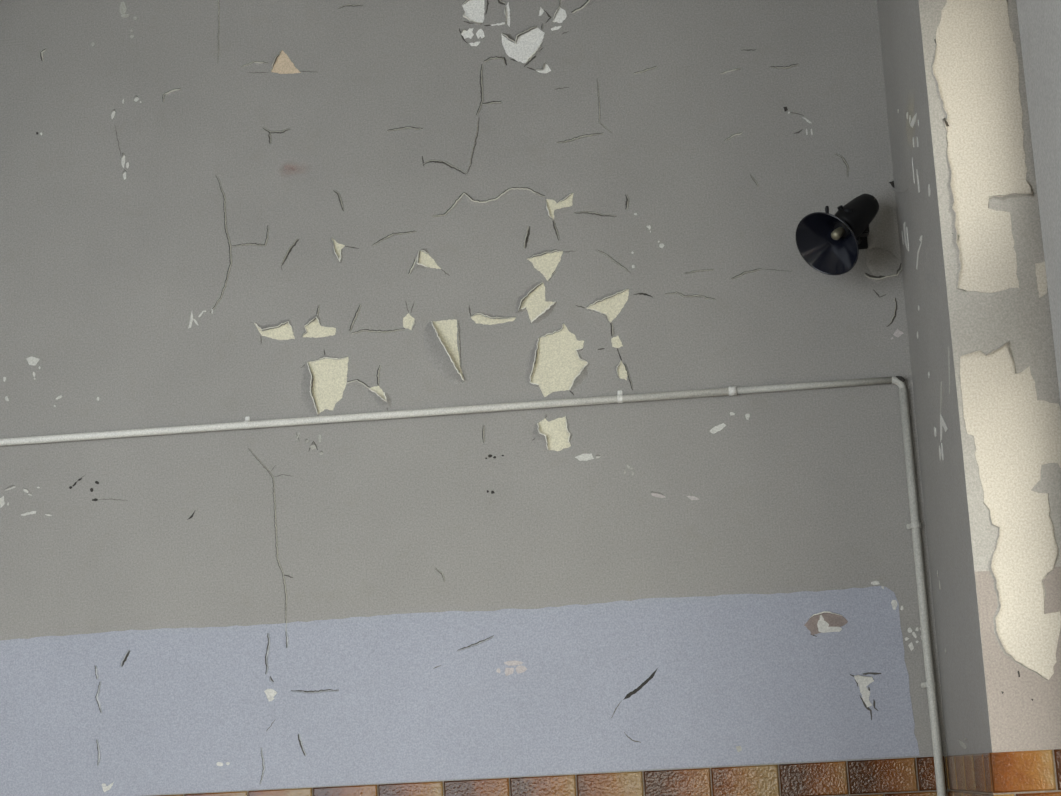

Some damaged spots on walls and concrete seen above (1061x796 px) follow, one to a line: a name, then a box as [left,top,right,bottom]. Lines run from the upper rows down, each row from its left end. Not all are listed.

peeling [459,0,569,73]
crack [210,176,299,313]
crack [263,127,291,144]
crack [373,64,545,249]
peeling [352,193,590,397]
crack [576,194,630,217]
crack [596,249,785,300]
peeling [931,0,1034,293]
peeling [300,350,392,415]
peeling [532,415,601,461]
peeling [960,340,1061,680]
crack [248,448,338,784]